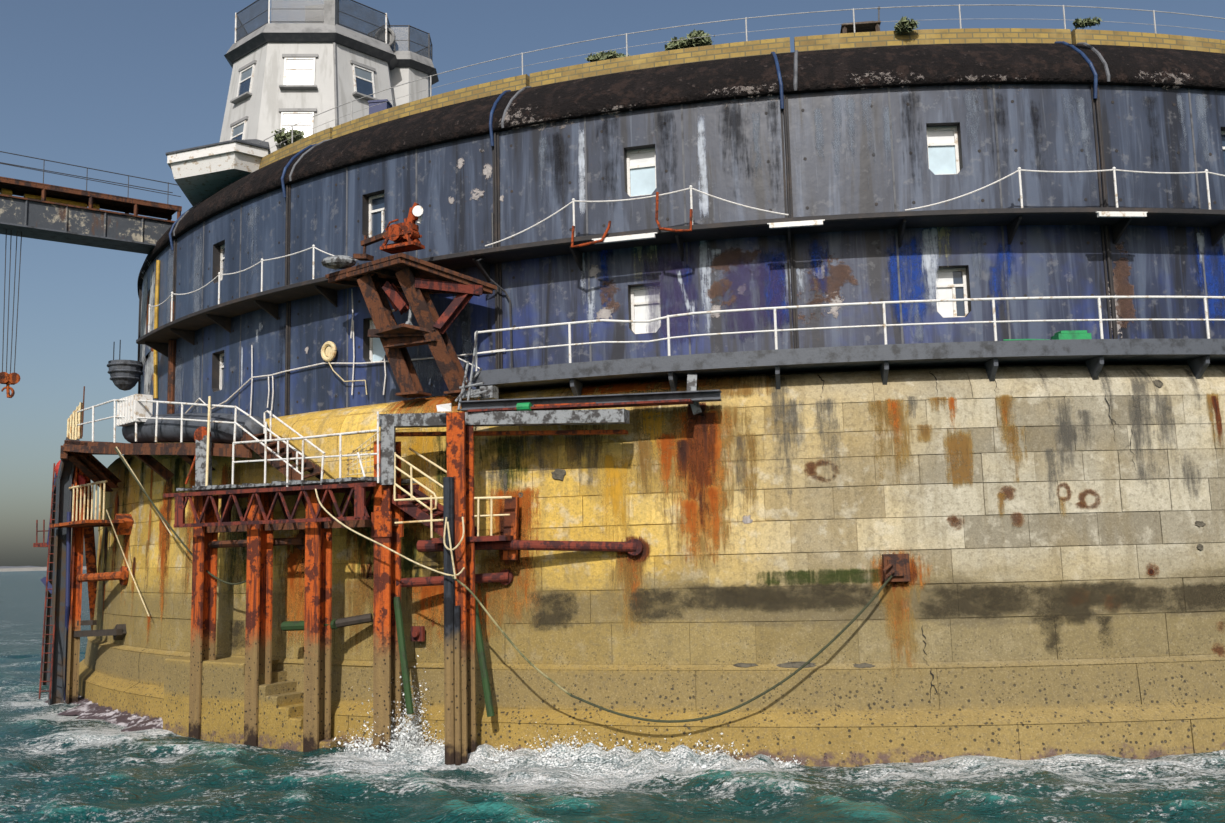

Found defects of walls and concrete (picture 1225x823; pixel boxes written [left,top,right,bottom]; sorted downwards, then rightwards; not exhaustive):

peeling [707,247,761,318]
rust [97,468,195,633]
rust [220,464,240,592]
rust [562,375,774,630]
rust [804,459,838,481]
rust [871,397,973,486]
rust [996,395,1027,527]
rust [1057,483,1100,512]
rust [1207,393,1222,438]
water stain [530,593,577,629]
water stain [629,583,875,621]
water stain [921,581,1225,650]